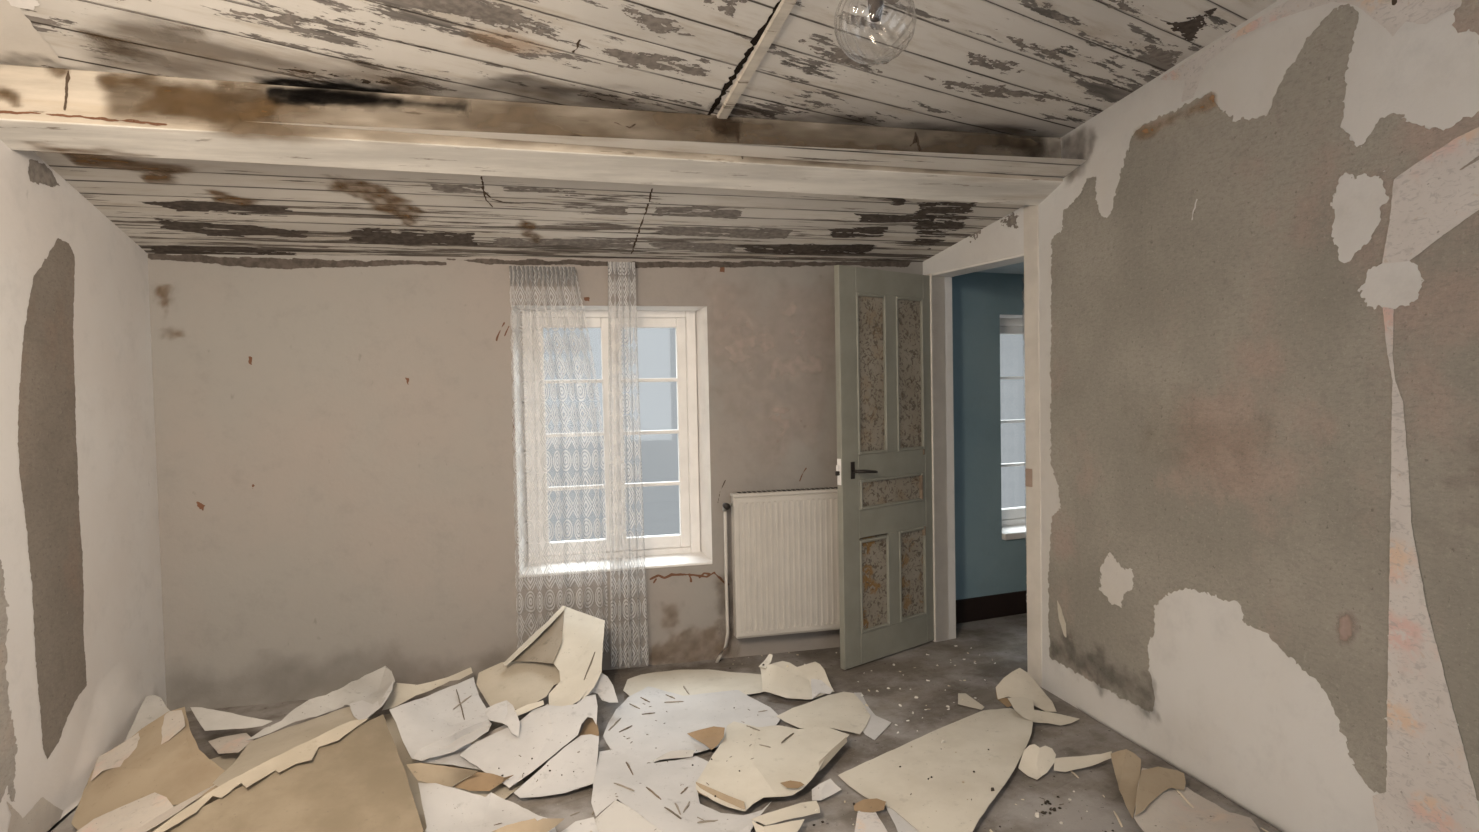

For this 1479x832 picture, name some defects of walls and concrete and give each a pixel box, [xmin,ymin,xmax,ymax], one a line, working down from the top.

peeling [391,0,559,42]
peeling [597,47,711,77]
crack [707,0,781,159]
peeling [924,29,1091,102]
water stain [103,78,1044,171]
flaking render [28,159,60,187]
peeling [142,201,308,255]
peeling [428,183,628,215]
peeling [347,198,981,272]
peeling [1048,0,1479,801]
flaking render [18,238,87,759]
flaking render [0,560,18,803]